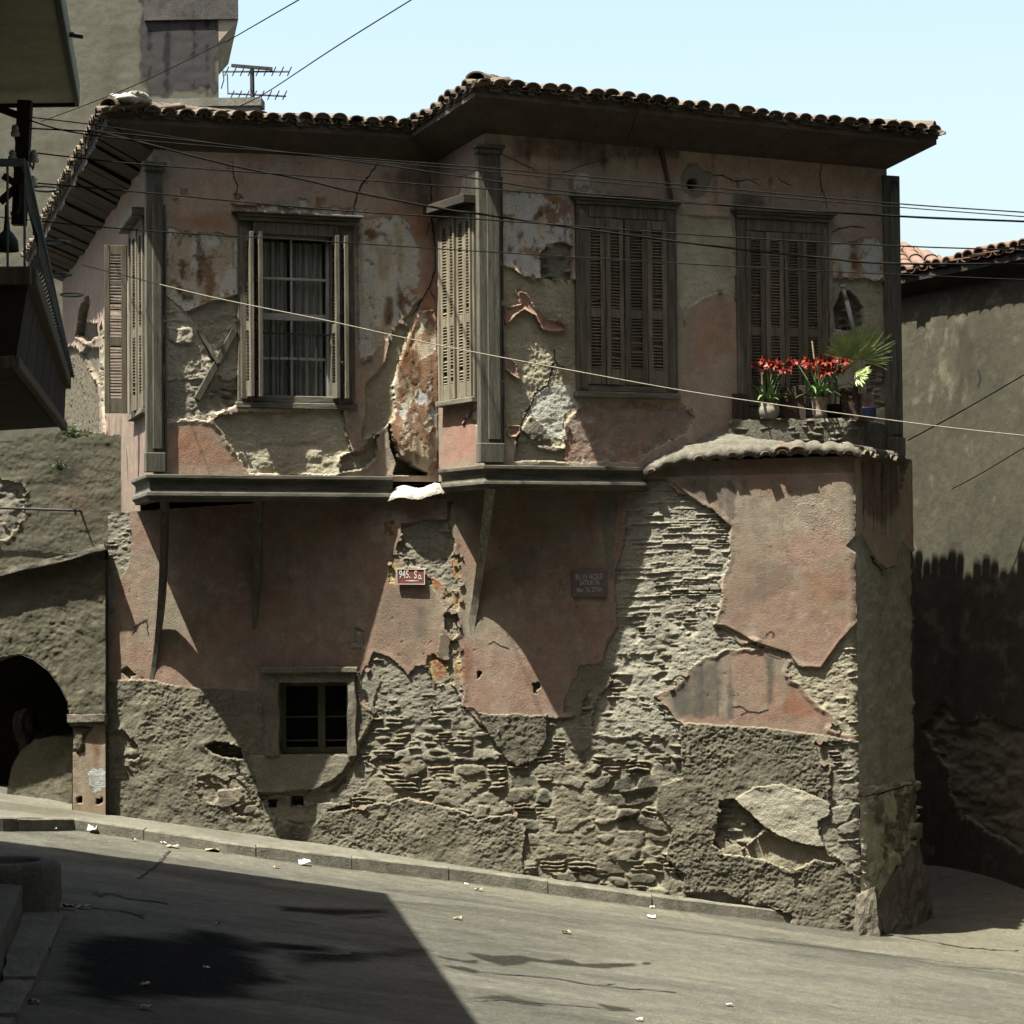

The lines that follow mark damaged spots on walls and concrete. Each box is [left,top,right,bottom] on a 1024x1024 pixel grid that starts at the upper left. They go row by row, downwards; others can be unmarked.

spalling [65,295,106,433]
spalling [163,193,428,475]
crack [516,349,566,448]
spalling [501,171,695,463]
crack [712,174,793,186]
spalling [196,473,793,923]
spalling [713,489,923,898]